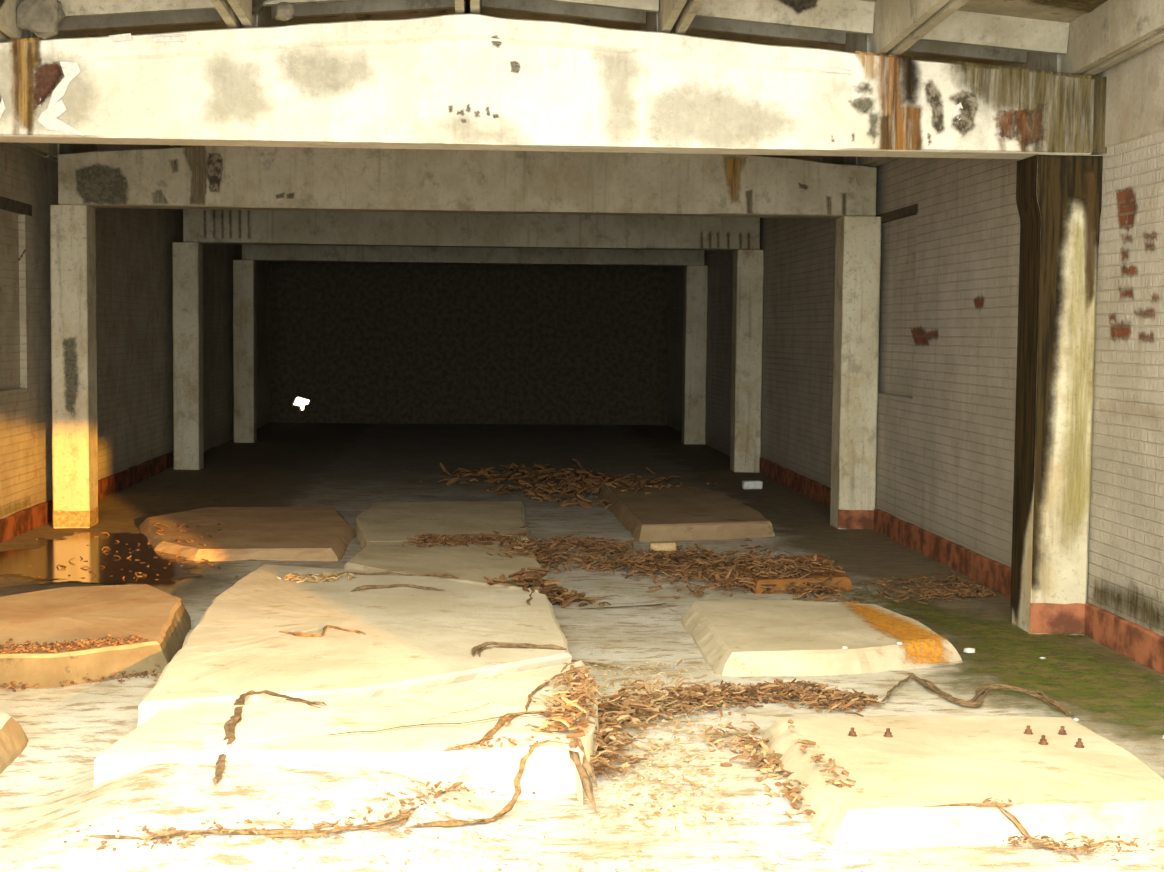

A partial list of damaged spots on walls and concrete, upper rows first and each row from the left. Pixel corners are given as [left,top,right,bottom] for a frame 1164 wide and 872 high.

spalling [0,0,65,39]
peeling [779,0,818,13]
rust [12,38,40,135]
rust [856,51,921,150]
spalling [925,82,978,136]
peeling [1116,188,1156,298]
leakage [952,61,1107,618]
peeling [1110,314,1154,342]